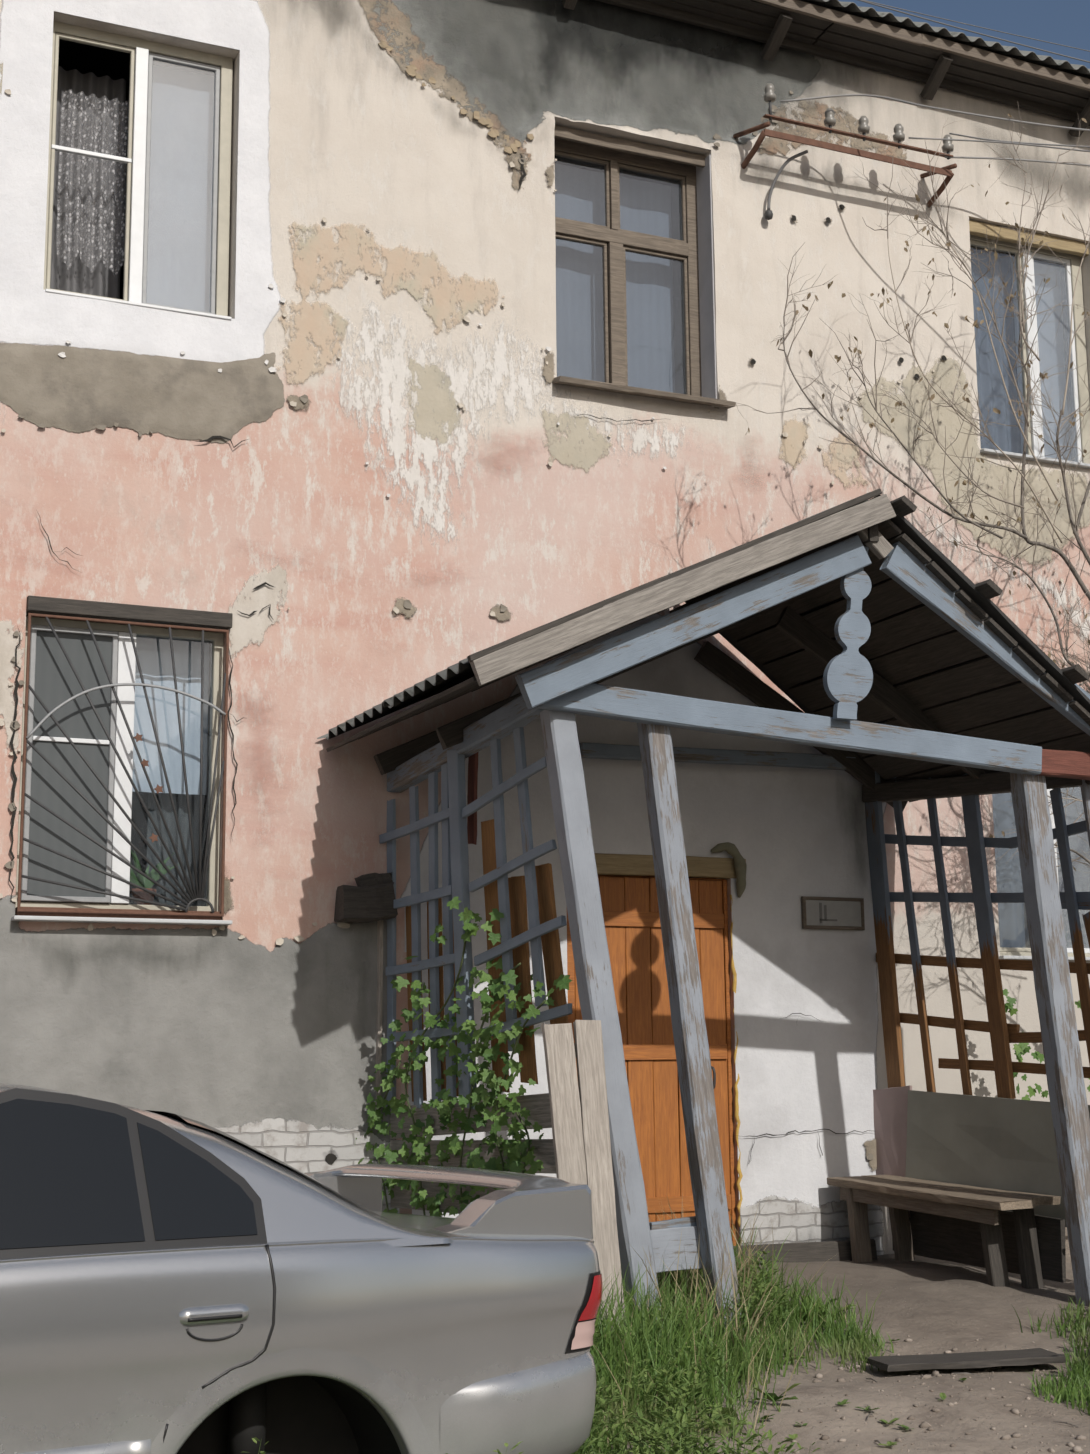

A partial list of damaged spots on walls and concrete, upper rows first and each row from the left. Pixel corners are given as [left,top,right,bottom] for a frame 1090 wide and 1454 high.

spalling [359,0,907,192]
damp [445,0,853,108]
peeling [264,217,685,543]
peeling [858,355,1090,640]
peeling [228,565,290,657]
peeling [0,620,25,755]
peeling [212,876,245,939]
flaking render [214,1117,394,1211]
crack [742,1129,870,1163]
flaking render [740,1195,850,1245]